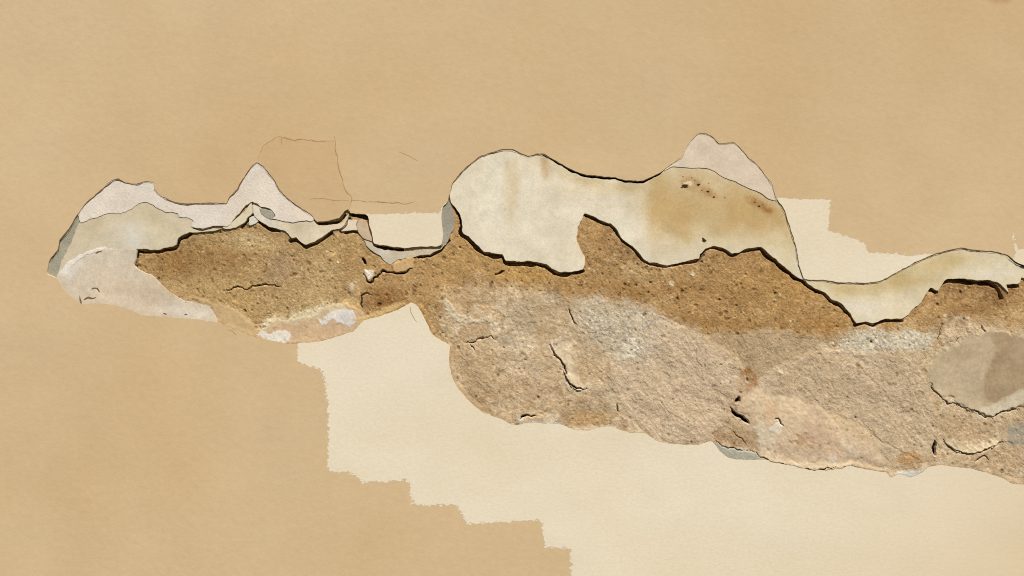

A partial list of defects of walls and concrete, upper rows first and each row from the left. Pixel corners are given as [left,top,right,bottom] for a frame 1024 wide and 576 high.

crack [258,136,415,211]
spalling [48,133,1024,484]
crack [714,397,768,460]